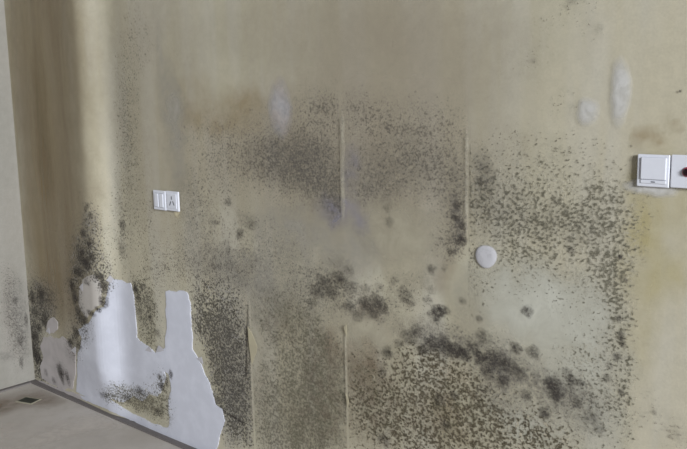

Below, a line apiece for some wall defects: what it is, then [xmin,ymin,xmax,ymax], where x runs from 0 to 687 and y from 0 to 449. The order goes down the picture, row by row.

damp [4,0,125,381]
peeling [39,275,225,449]
damp [113,21,651,449]